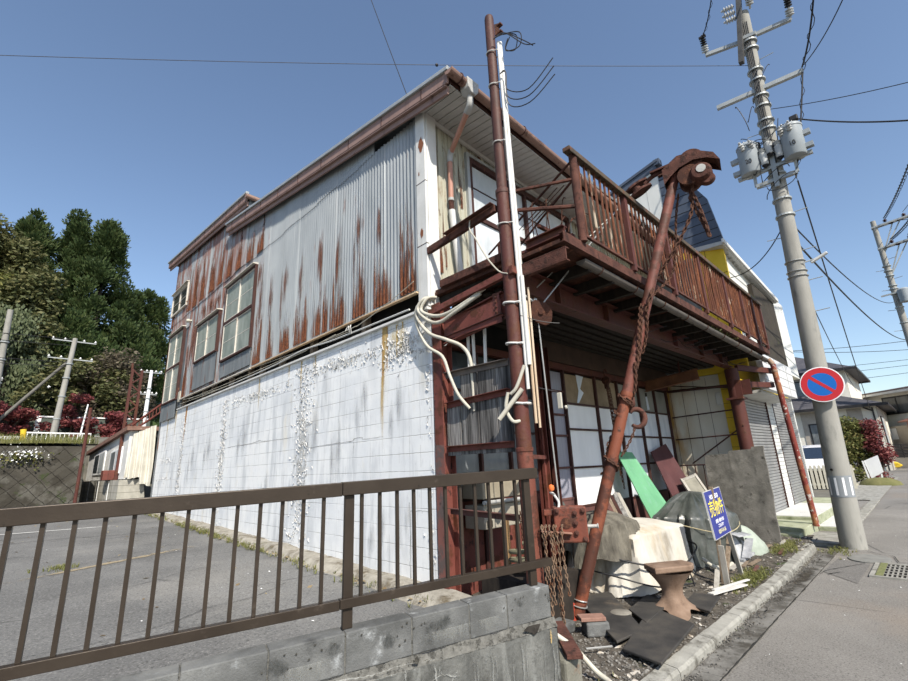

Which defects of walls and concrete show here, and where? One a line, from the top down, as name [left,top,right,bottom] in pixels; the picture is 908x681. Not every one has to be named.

corrosion [186,213,265,318]
corrosion [252,215,423,365]
corrosion [439,223,448,273]
corrosion [181,326,196,397]